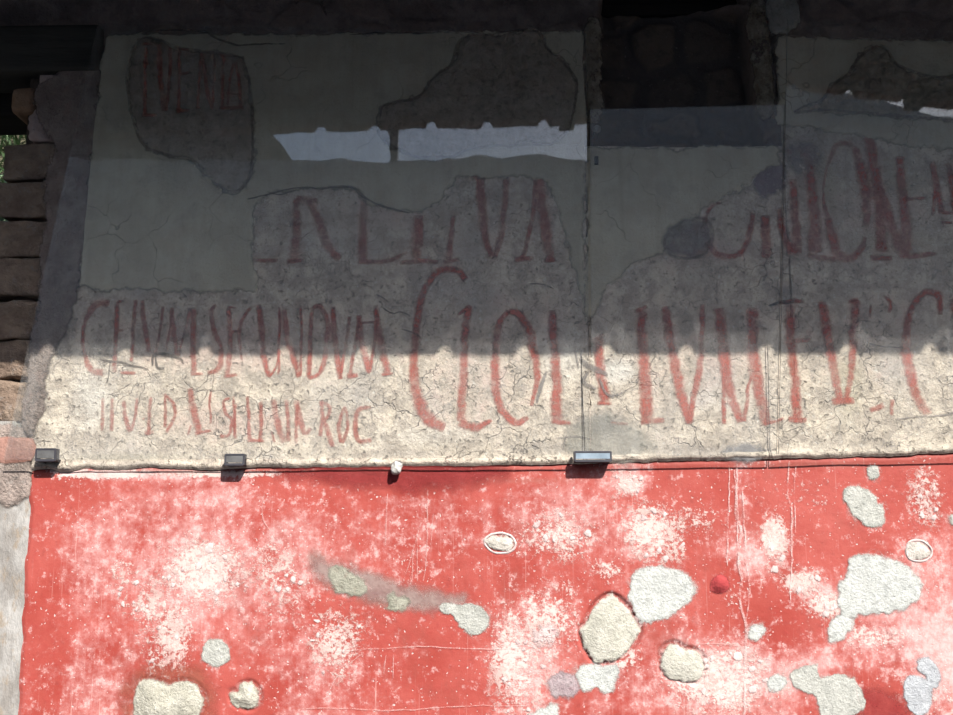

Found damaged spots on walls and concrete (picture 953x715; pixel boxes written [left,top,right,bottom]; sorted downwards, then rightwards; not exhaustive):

spalling [376,28,578,161]
spalling [795,45,953,122]
damp [548,671,580,699]